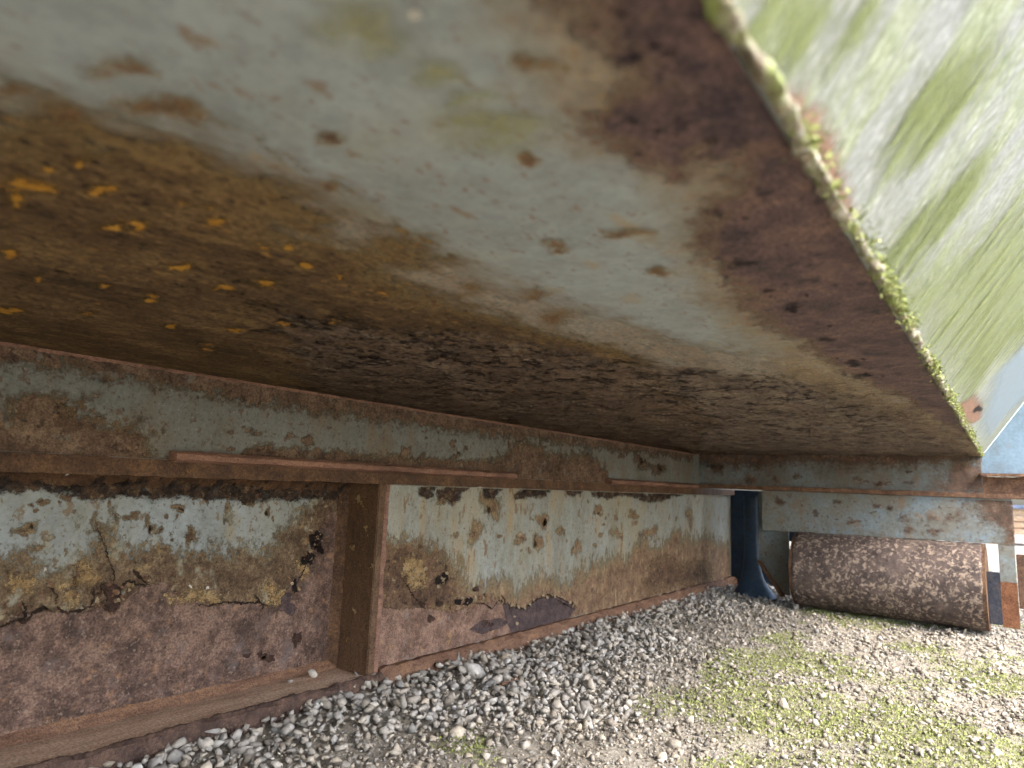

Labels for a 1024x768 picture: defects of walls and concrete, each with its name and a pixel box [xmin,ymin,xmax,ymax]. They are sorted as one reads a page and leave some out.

rust [0,0,1016,554]
crack [0,521,150,627]
peeling [0,497,338,736]
crack [195,595,269,611]
rust [278,593,295,616]
rust [382,491,730,634]